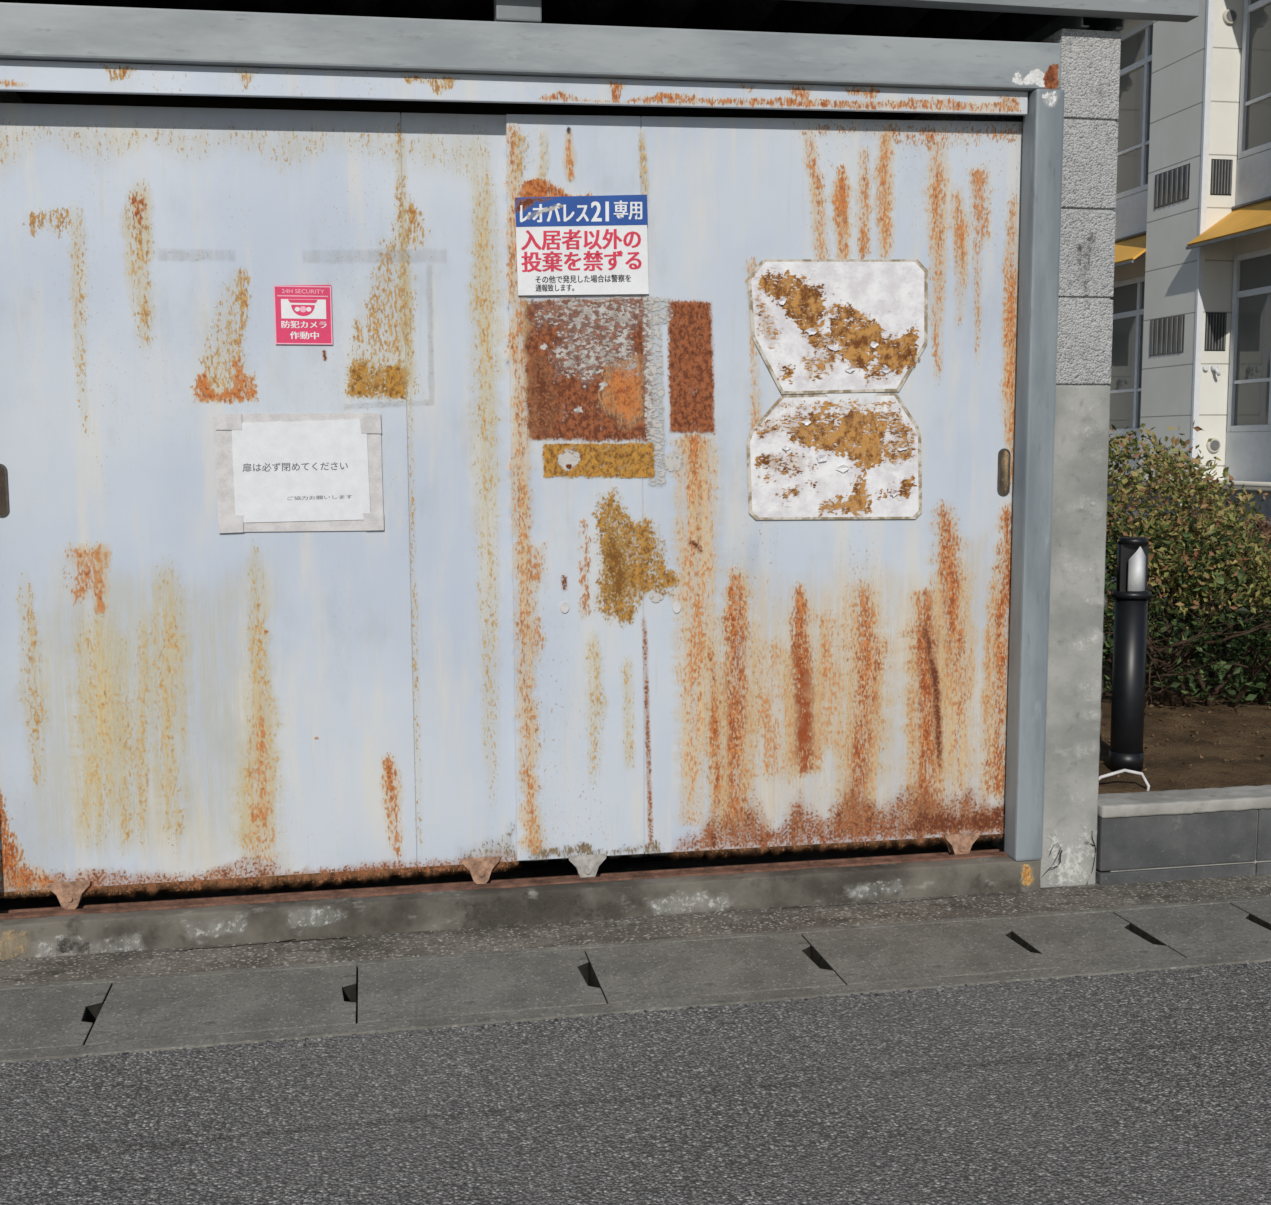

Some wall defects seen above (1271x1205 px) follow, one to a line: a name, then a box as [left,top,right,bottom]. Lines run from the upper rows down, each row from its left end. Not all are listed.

rust [100,64,133,81]
rust [404,75,461,95]
rust [0,81,1023,897]
rust [1021,864,1033,886]